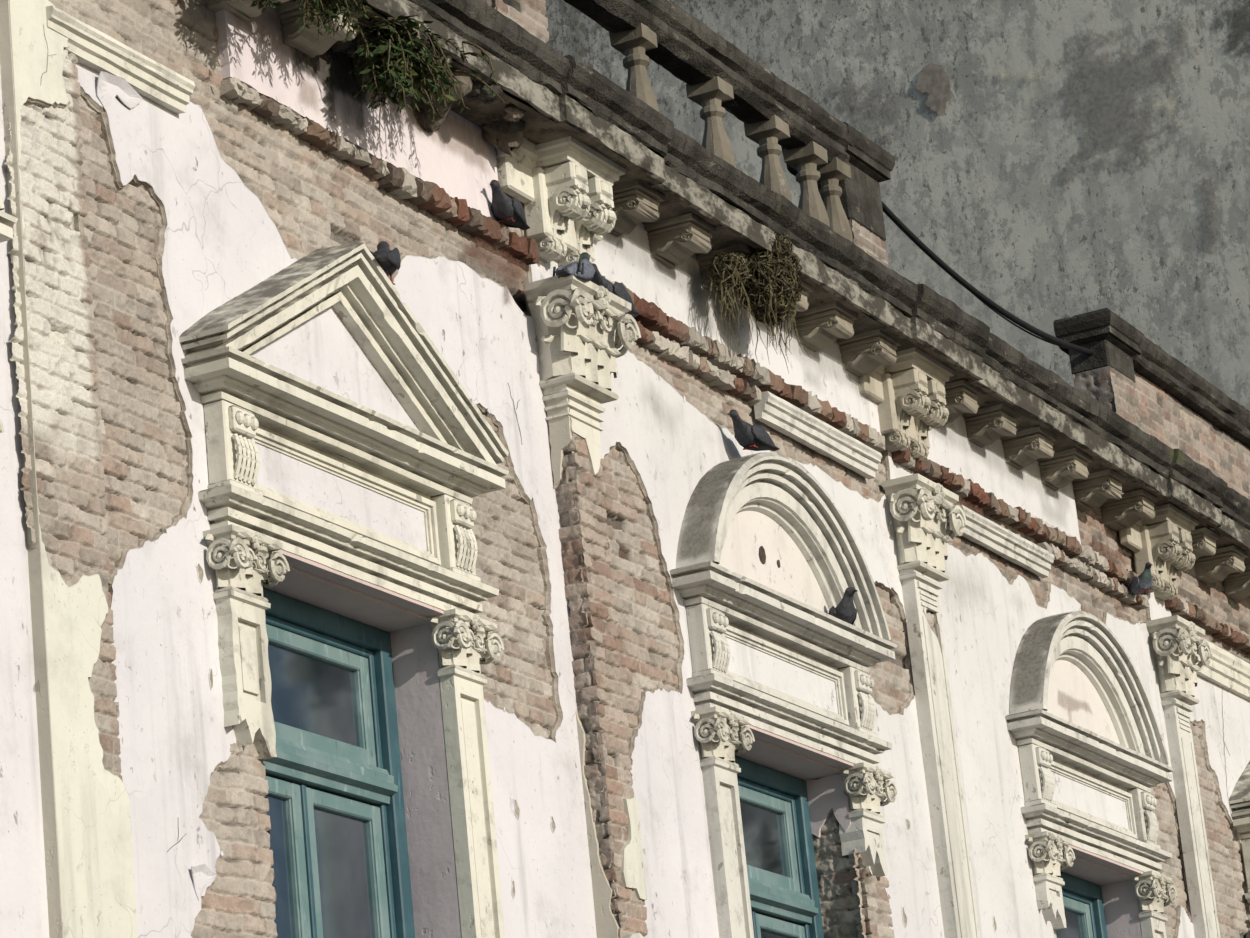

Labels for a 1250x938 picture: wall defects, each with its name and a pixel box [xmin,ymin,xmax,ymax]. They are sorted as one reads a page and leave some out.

spalling [4,48,194,785]
spalling [48,0,533,317]